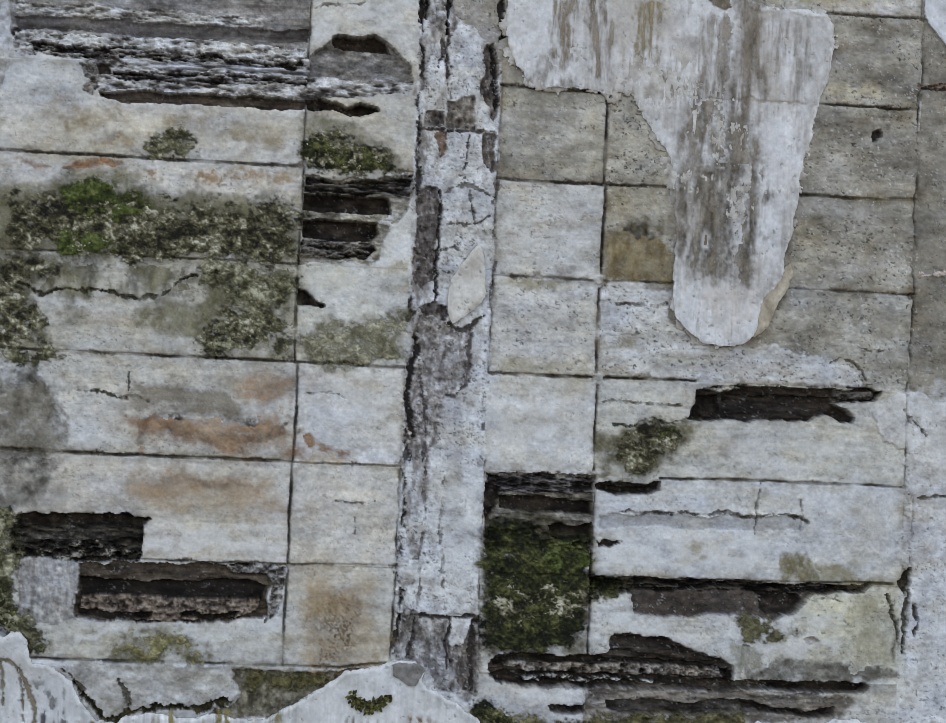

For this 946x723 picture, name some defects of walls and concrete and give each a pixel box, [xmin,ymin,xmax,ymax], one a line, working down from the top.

spalling [8,0,414,111]
crack [917,83,946,93]
crack [19,269,219,302]
damp [0,171,297,317]
damp [137,281,238,341]
spalling [299,174,486,462]
crack [917,270,946,278]
damp [593,423,692,475]
crack [619,481,810,539]
spalling [8,511,289,625]
spalling [616,575,871,620]
spalling [389,608,735,703]